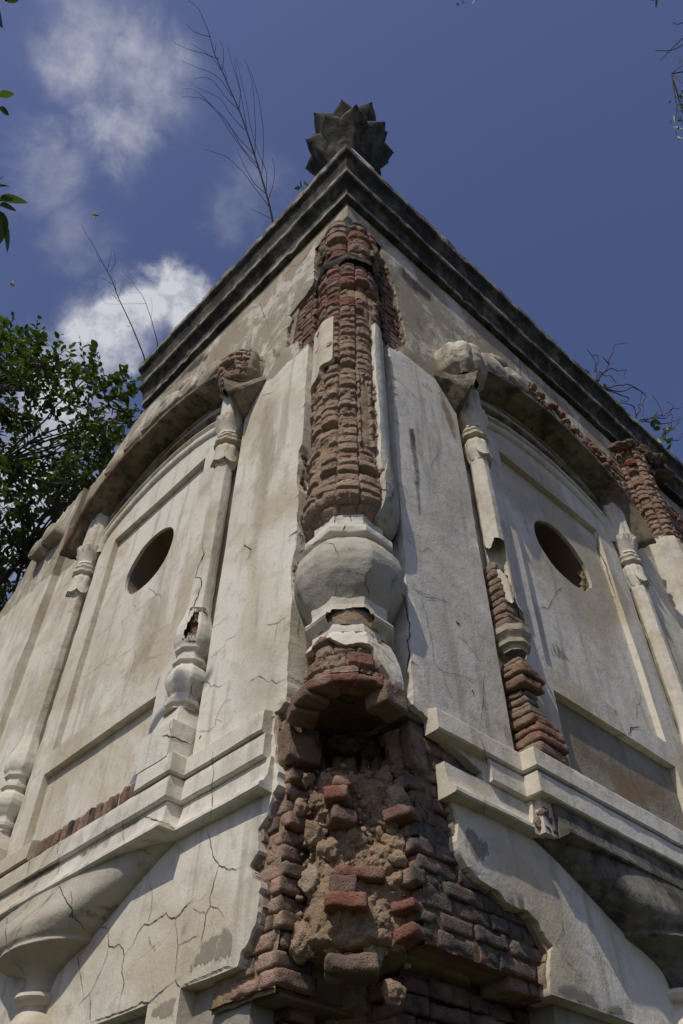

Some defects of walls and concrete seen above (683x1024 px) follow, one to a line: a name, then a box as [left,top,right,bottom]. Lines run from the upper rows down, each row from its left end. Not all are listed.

spalling [185,607,206,642]
spalling [217,349,263,397]
spalling [295,220,402,543]
spalling [525,380,683,630]
spalling [35,782,137,857]
crack [57,589,242,1023]
spalling [208,608,542,1024]